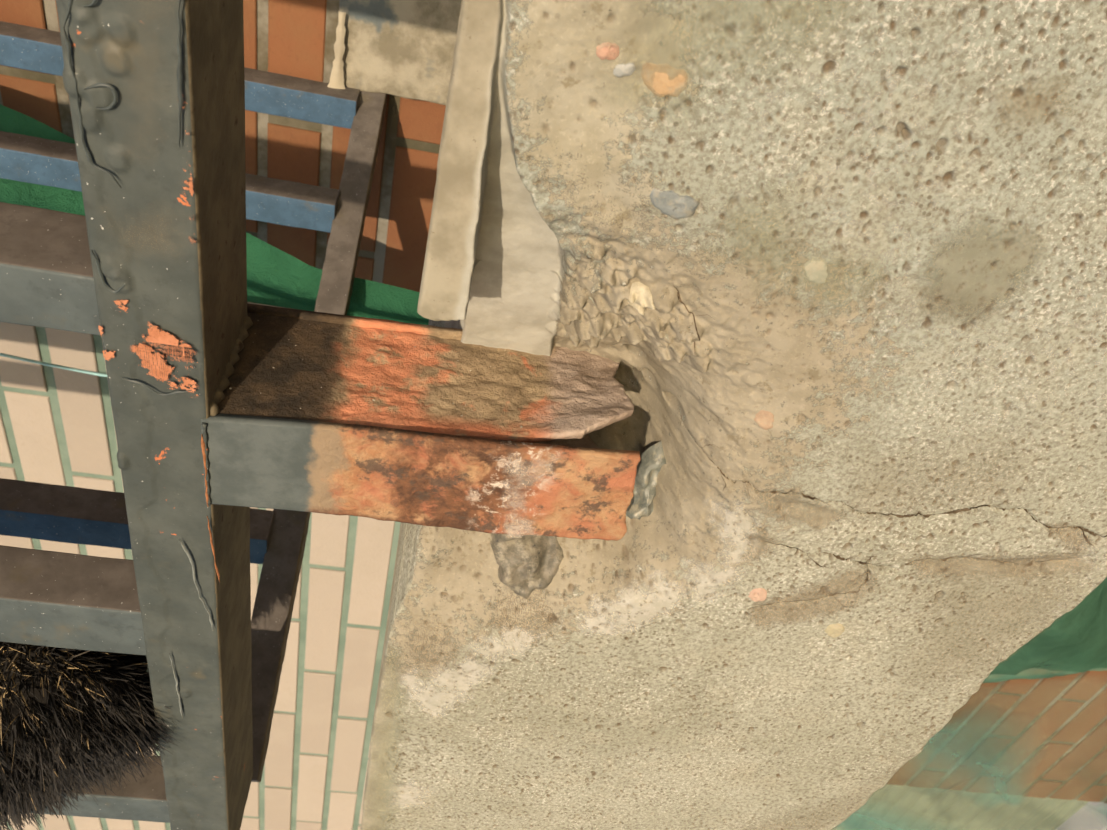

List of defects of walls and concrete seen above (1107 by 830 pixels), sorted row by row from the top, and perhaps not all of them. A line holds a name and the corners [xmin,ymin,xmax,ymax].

peeling [98,326,116,361]
peeling [131,322,199,396]
spalling [386,0,913,691]
corrosion [201,436,220,582]
damp [693,510,752,599]
crack [679,411,1107,611]
damp [587,573,678,634]
damp [407,630,531,715]